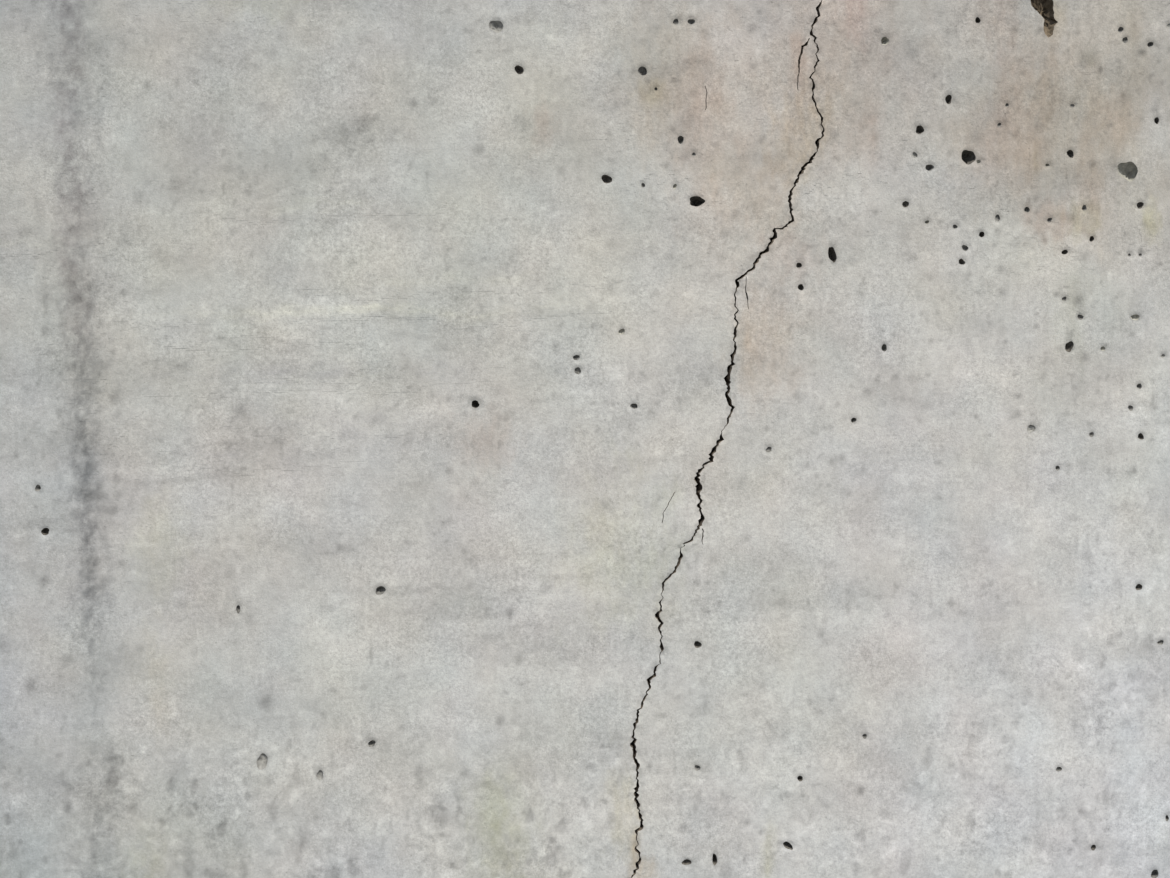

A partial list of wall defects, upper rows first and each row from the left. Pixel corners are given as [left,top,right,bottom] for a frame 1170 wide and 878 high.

crack [624,0,831,878]